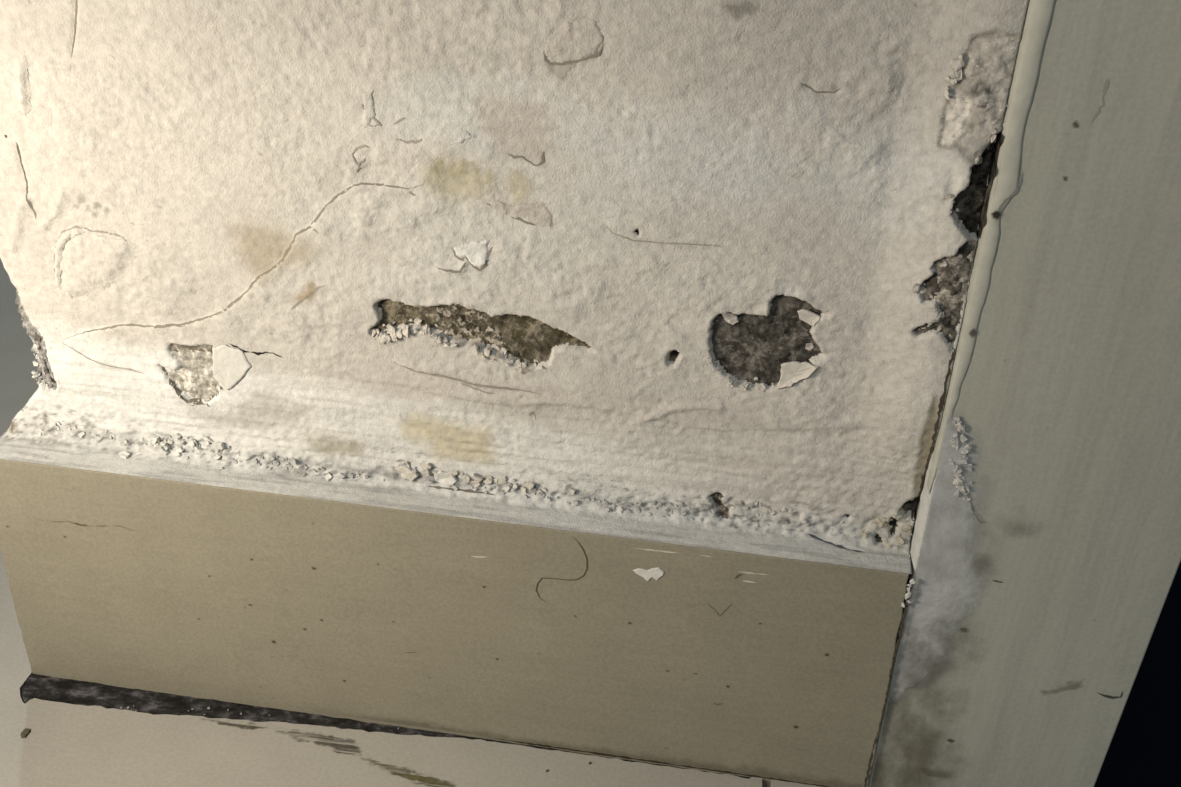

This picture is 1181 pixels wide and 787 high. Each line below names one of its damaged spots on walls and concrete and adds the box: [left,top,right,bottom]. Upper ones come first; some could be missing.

spalling [912,33,1020,343]
crack [64,179,427,375]
spalling [17,292,57,390]
spalling [157,343,284,407]
spalling [371,299,591,375]
spalling [707,295,822,392]
spalling [54,421,369,481]
spalling [395,461,788,527]